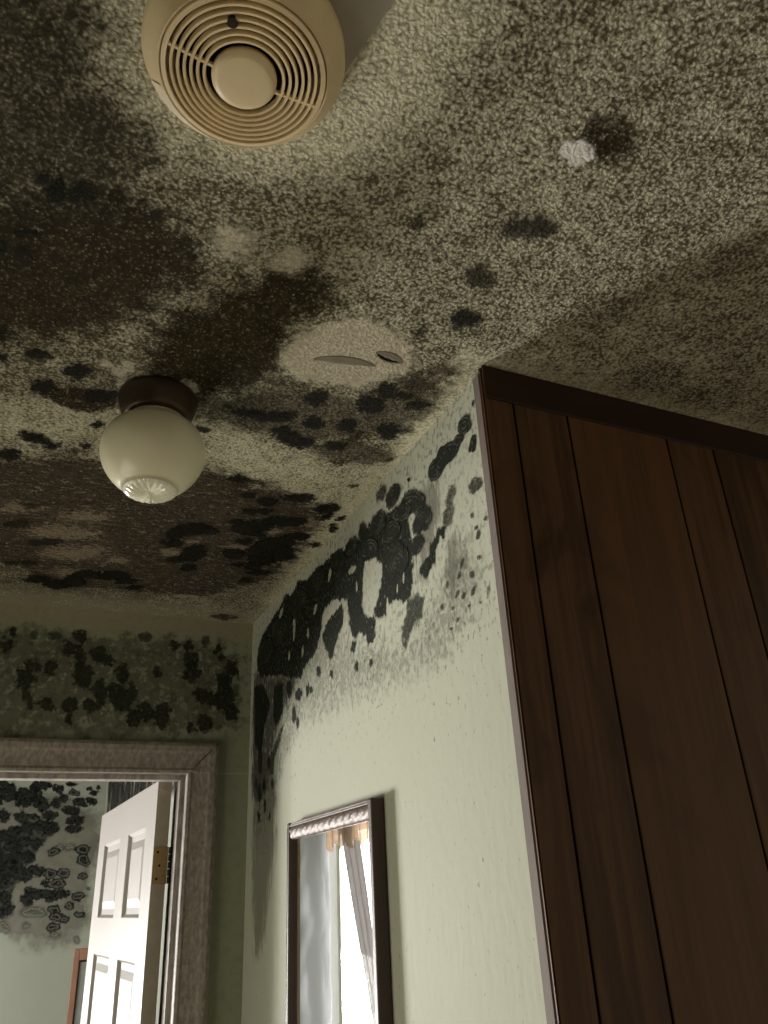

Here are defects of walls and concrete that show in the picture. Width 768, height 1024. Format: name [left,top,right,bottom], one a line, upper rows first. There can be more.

leakage [0,0,435,467]
leakage [449,310,484,331]
leakage [428,400,476,481]
leakage [468,477,482,494]
leakage [0,430,455,823]
leakage [440,556,489,630]
leakage [0,780,156,944]